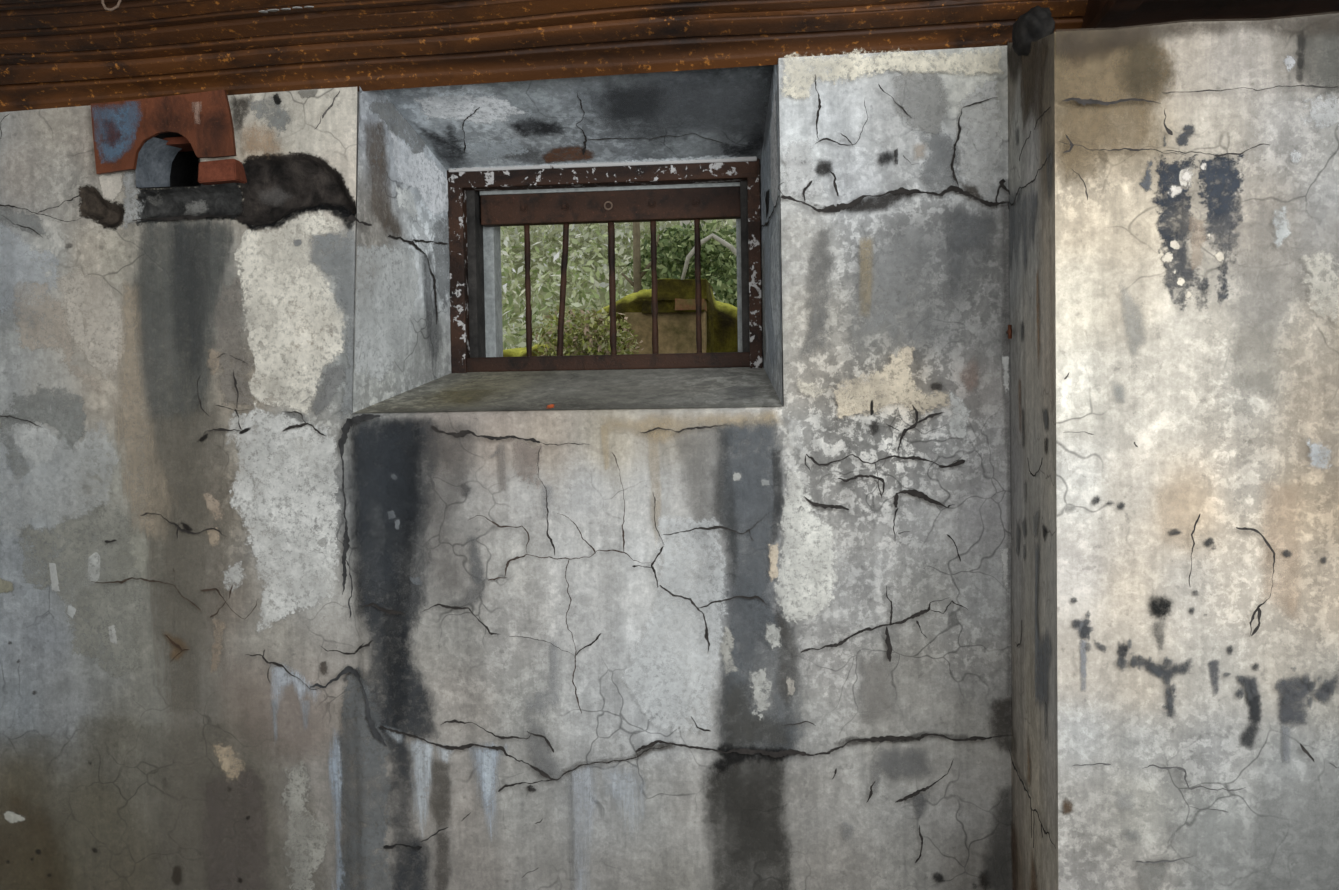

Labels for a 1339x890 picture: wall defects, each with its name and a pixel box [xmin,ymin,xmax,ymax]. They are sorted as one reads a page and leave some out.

crack [0,195,82,238]
flaking render [78,152,357,230]
crack [760,74,1339,230]
crack [197,353,249,441]
water stain [135,218,232,708]
crack [91,513,259,619]
water stain [352,419,470,890]
crack [246,404,1056,863]
water stain [699,424,803,890]
water stain [1071,598,1191,716]
water stain [1209,646,1261,747]
water stain [1275,667,1338,761]